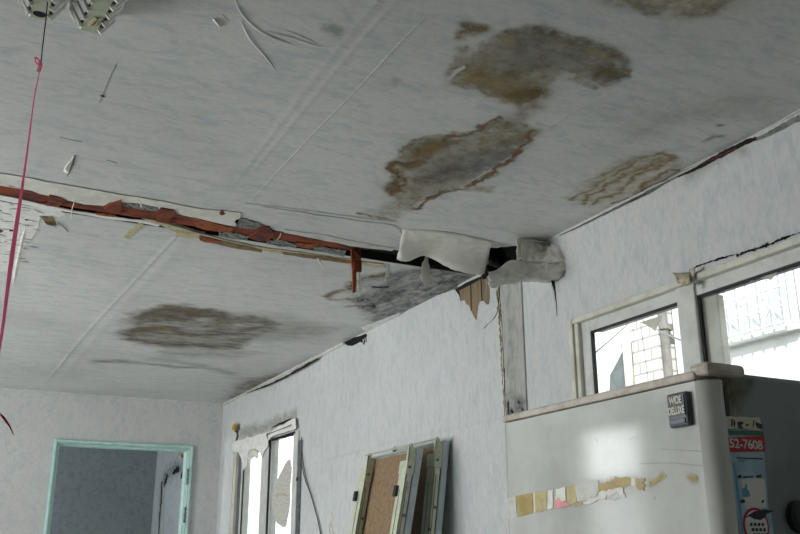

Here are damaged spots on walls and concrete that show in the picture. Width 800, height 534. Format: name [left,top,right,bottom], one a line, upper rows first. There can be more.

water stain [456,23,487,39]
water stain [447,26,631,108]
water stain [385,116,534,210]
water stain [573,153,677,204]
crack [559,109,800,236]
peeling [0,201,66,285]
crack [689,232,800,271]
mould [324,273,418,319]
water stain [124,306,273,349]